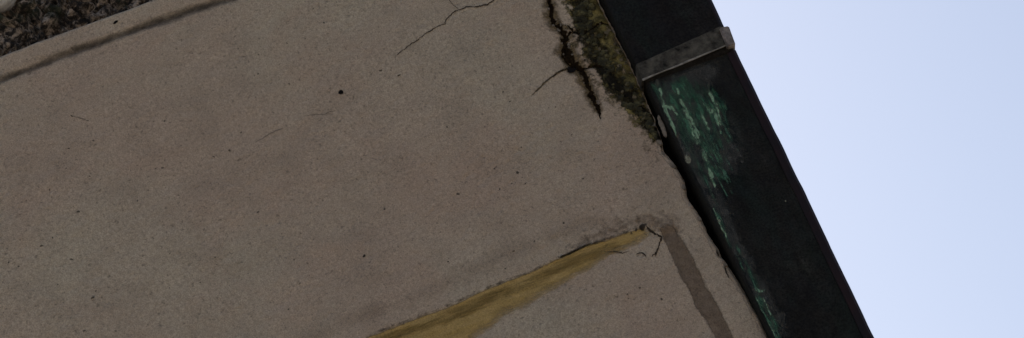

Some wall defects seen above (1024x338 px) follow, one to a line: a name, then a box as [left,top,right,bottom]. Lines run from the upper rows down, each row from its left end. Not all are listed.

crack [395,0,494,76]
crack [533,0,610,119]
crack [607,226,662,256]
water stain [651,63,787,338]